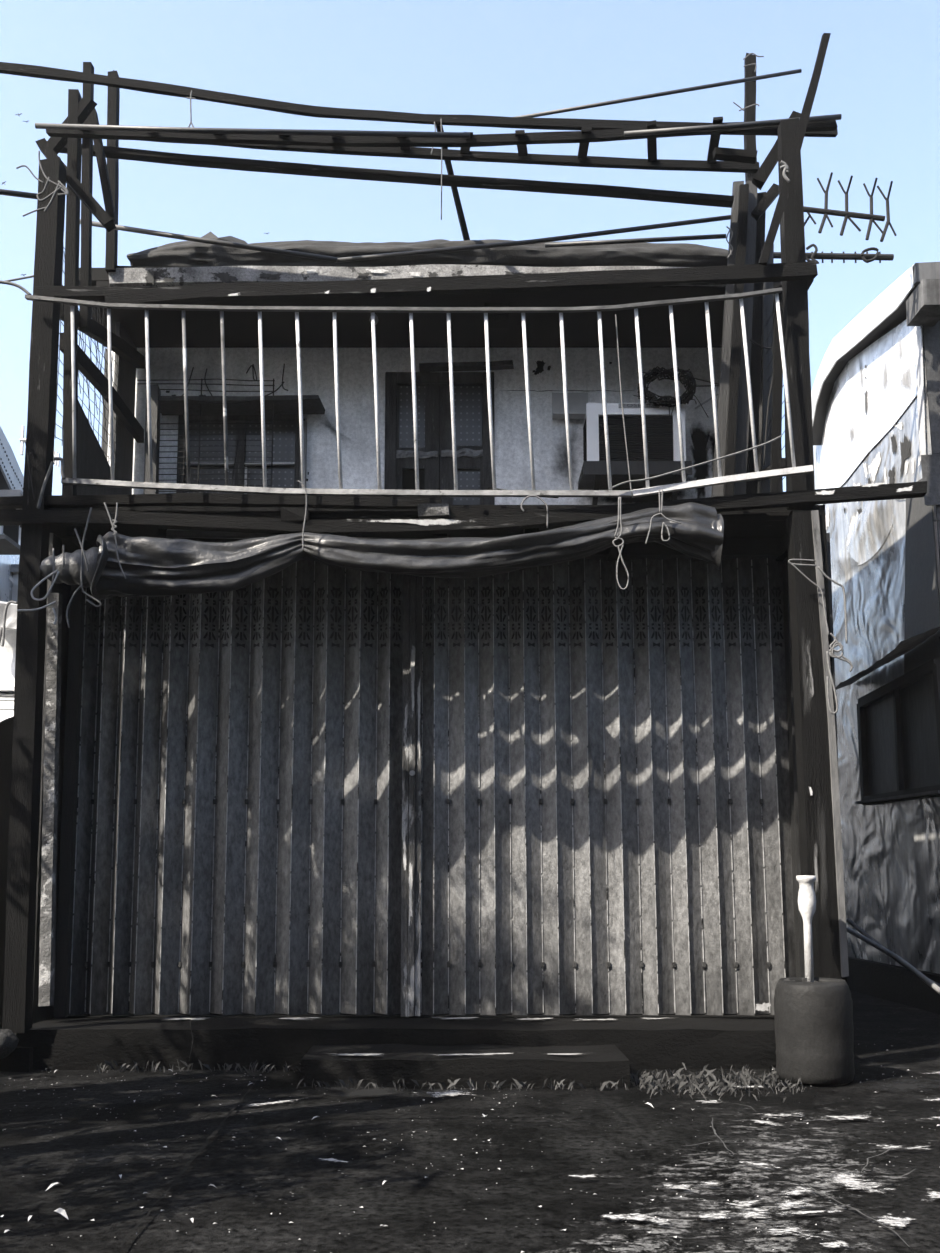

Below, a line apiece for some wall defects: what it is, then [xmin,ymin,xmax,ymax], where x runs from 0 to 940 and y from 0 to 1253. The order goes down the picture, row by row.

water stain [558,439,574,473]
peeling [405,643,421,764]
peeling [403,820,413,926]